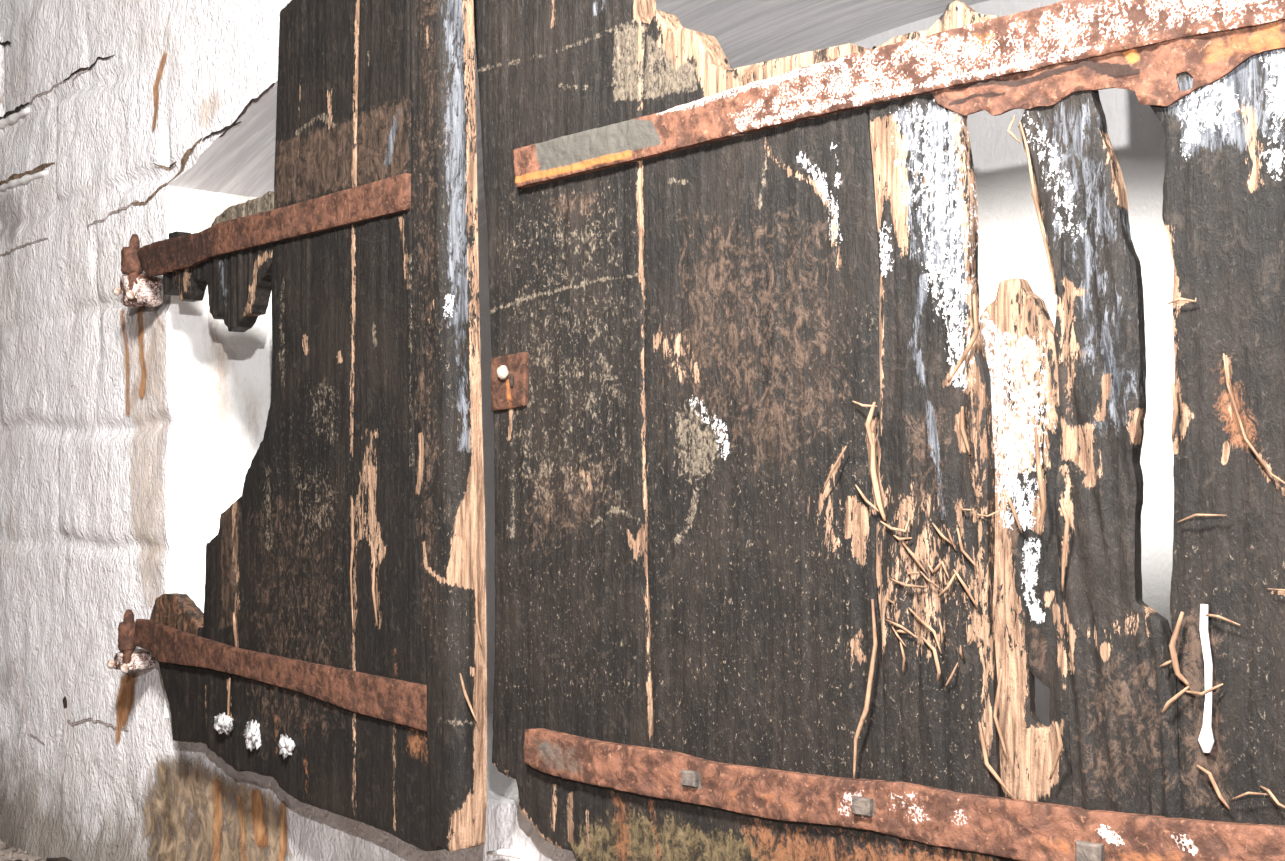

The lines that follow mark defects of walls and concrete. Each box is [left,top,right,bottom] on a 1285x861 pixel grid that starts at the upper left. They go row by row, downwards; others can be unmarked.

crack [0,54,115,129]
corrosion [152,52,167,131]
crack [0,162,54,192]
crack [87,83,275,226]
crack [0,238,48,255]
corrosion [120,305,163,415]
corrosion [115,673,136,743]
damp [144,756,289,861]